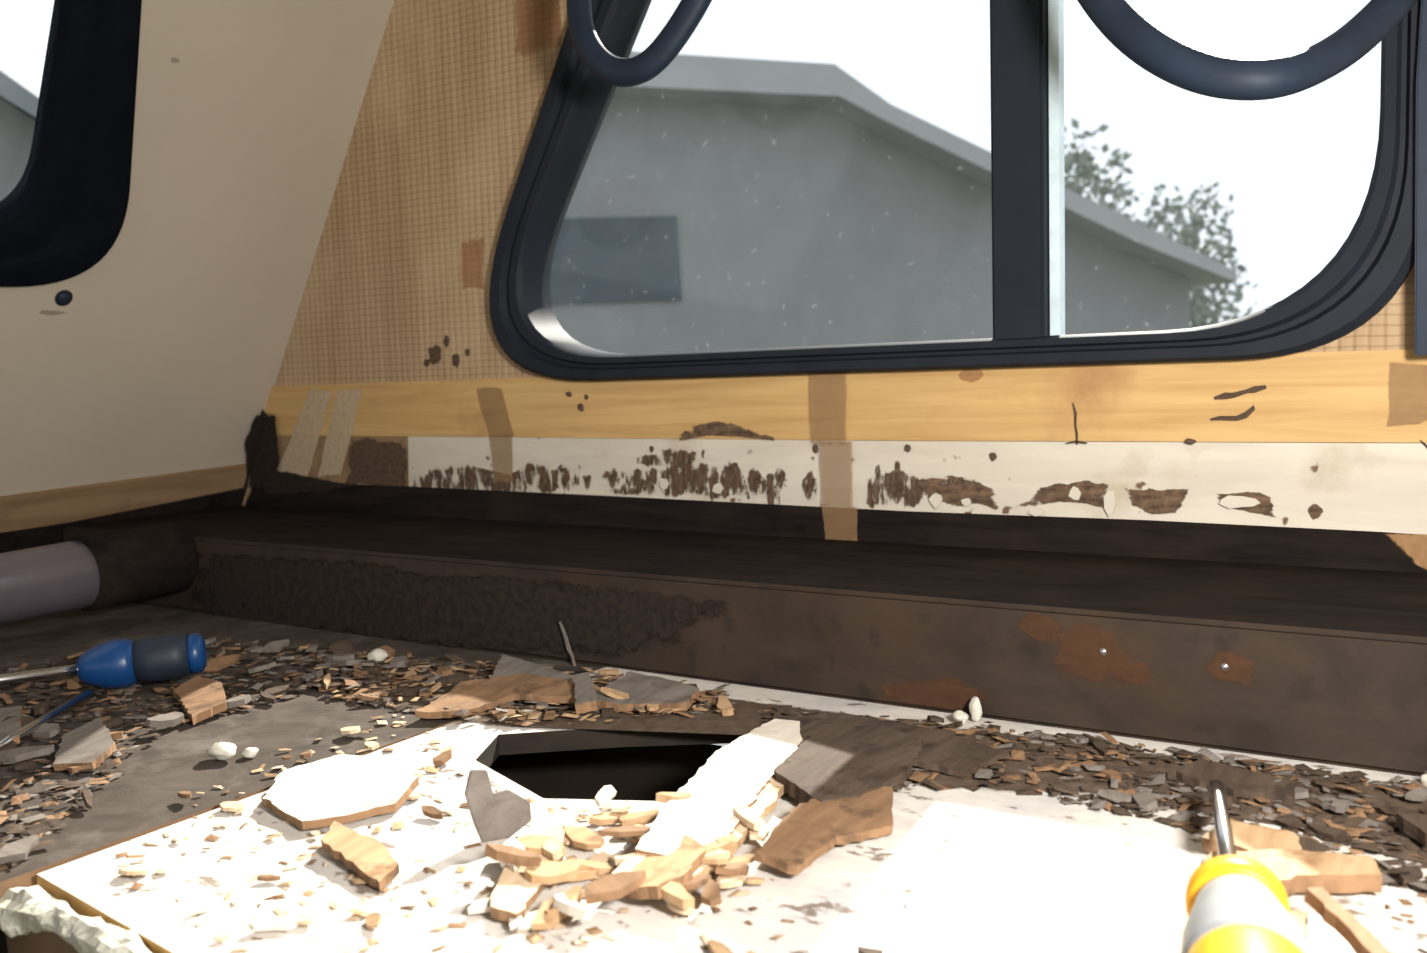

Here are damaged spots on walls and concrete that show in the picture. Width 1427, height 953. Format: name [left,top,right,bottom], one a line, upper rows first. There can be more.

peeling [413,449,817,504]
peeling [867,461,998,510]
peeling [1020,480,1188,517]
peeling [1218,492,1275,517]
peeling [1308,504,1323,519]